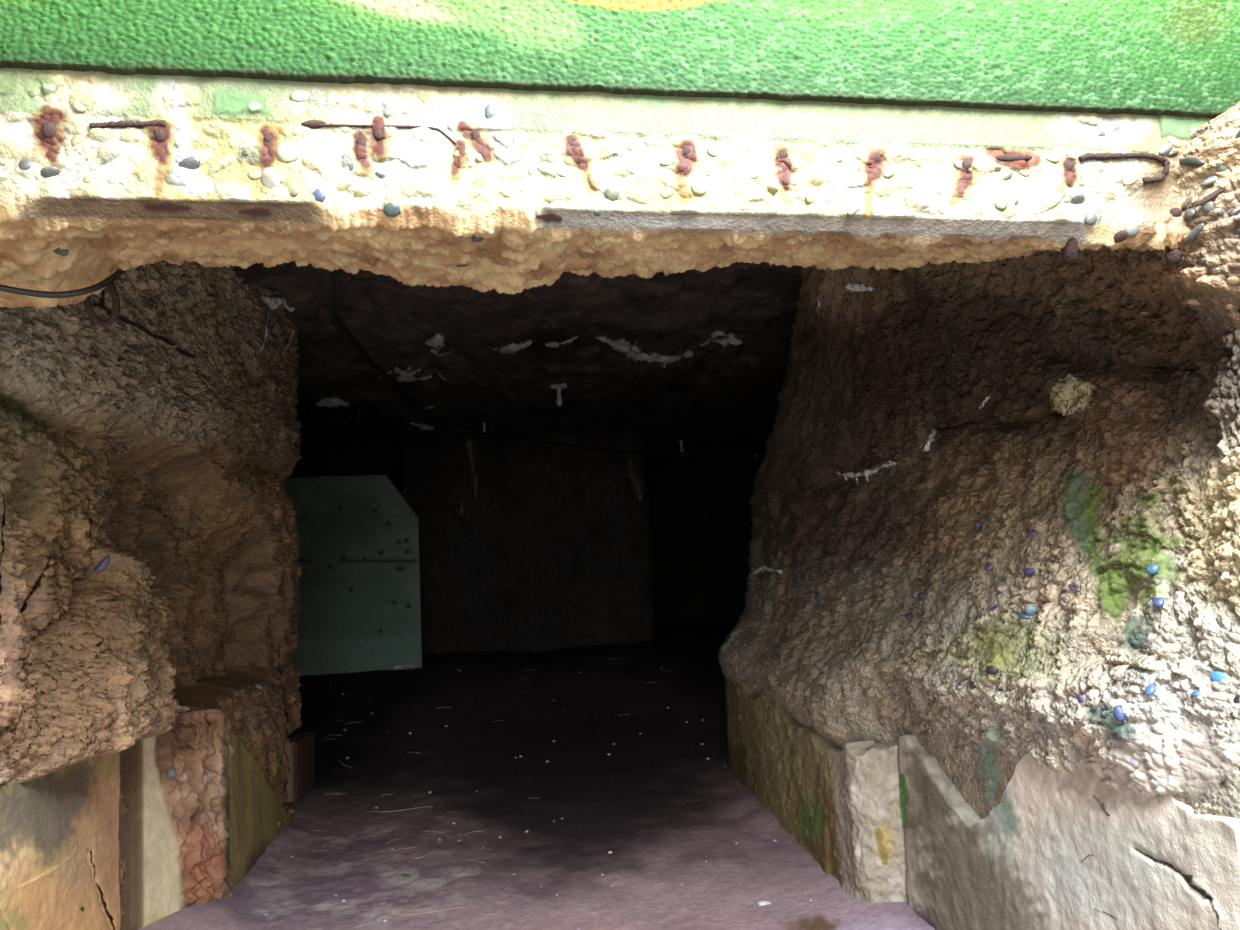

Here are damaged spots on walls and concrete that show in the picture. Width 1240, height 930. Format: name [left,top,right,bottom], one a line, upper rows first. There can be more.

rust [34,104,67,170]
rust [145,120,190,211]
rust [352,115,390,177]
rust [451,121,495,181]
rust [565,134,596,192]
rust [950,146,1041,204]
efflorescence [488,336,578,354]
efflorescence [596,331,742,369]
leakage [1082,482,1150,651]
leakage [1087,703,1134,741]
crack [89,851,115,930]
crack [1135,848,1222,930]